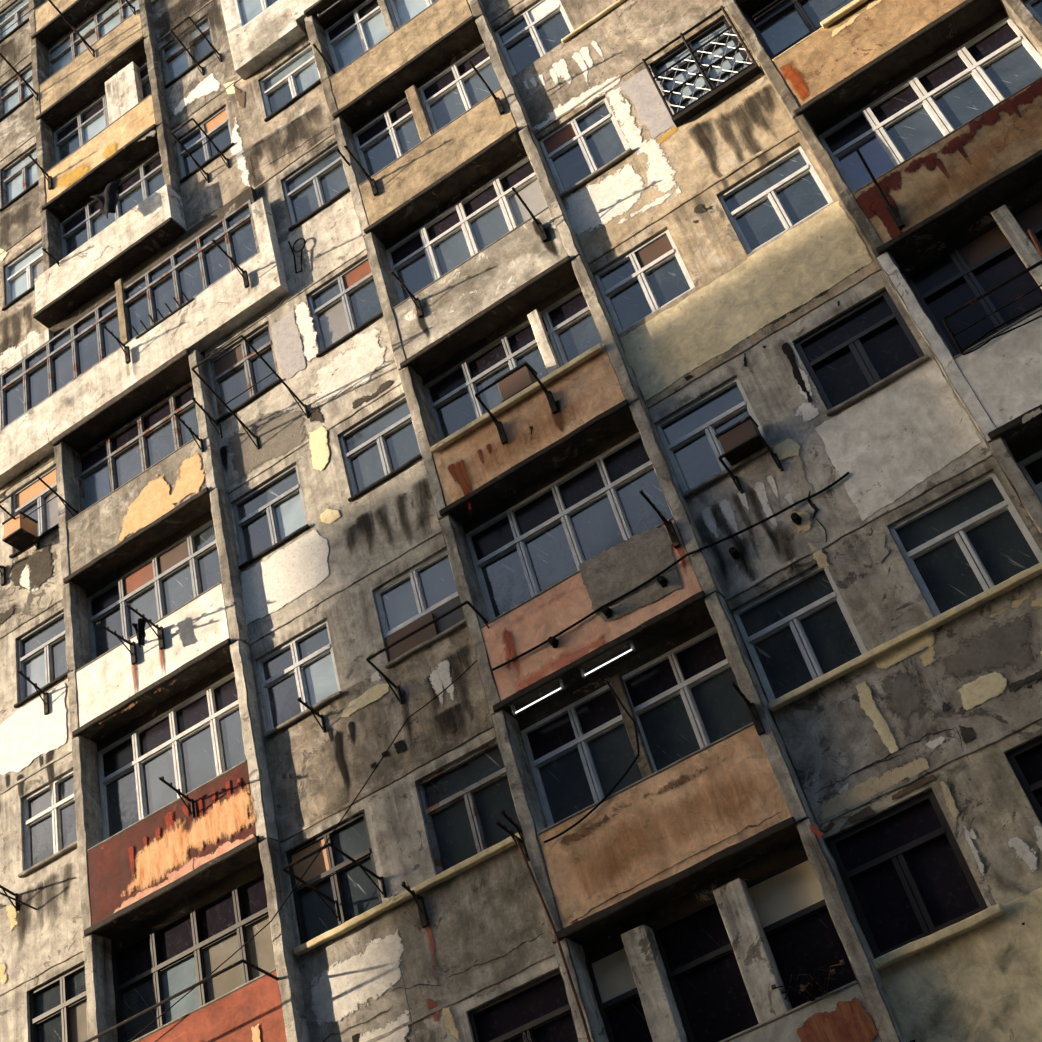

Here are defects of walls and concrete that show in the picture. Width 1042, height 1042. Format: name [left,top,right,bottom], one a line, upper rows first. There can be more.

peeling [523,40,682,236]
leakage [656,127,677,144]
leakage [691,85,773,183]
peeling [856,78,1042,245]
peeling [119,450,205,541]
leakage [347,479,429,548]
corrosion [448,460,471,510]
peeling [241,530,329,624]
peeling [429,660,455,707]
peeling [112,784,257,923]
peeling [308,928,406,1026]
peeling [352,1010,412,1042]